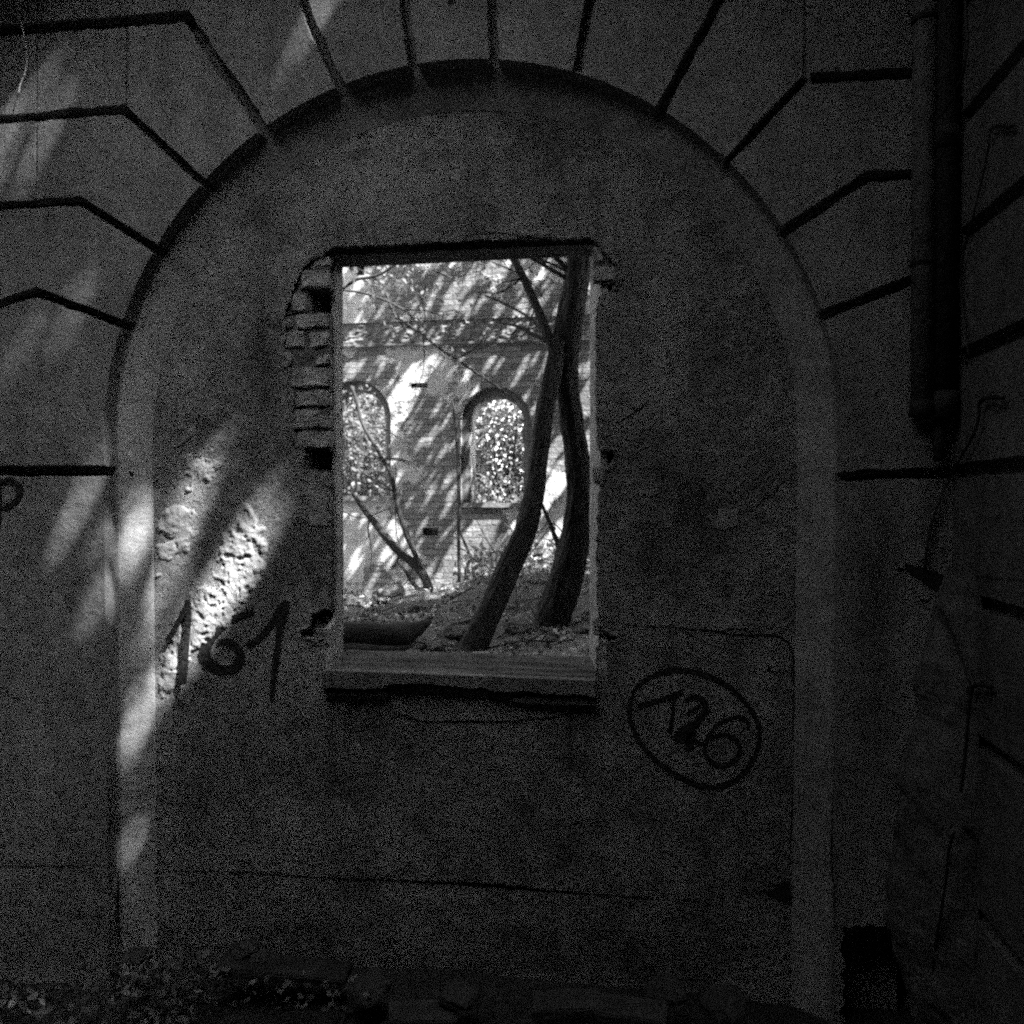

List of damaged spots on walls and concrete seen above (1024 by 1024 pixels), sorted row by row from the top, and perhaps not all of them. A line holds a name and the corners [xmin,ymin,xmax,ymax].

flaking render [154,250,334,700]